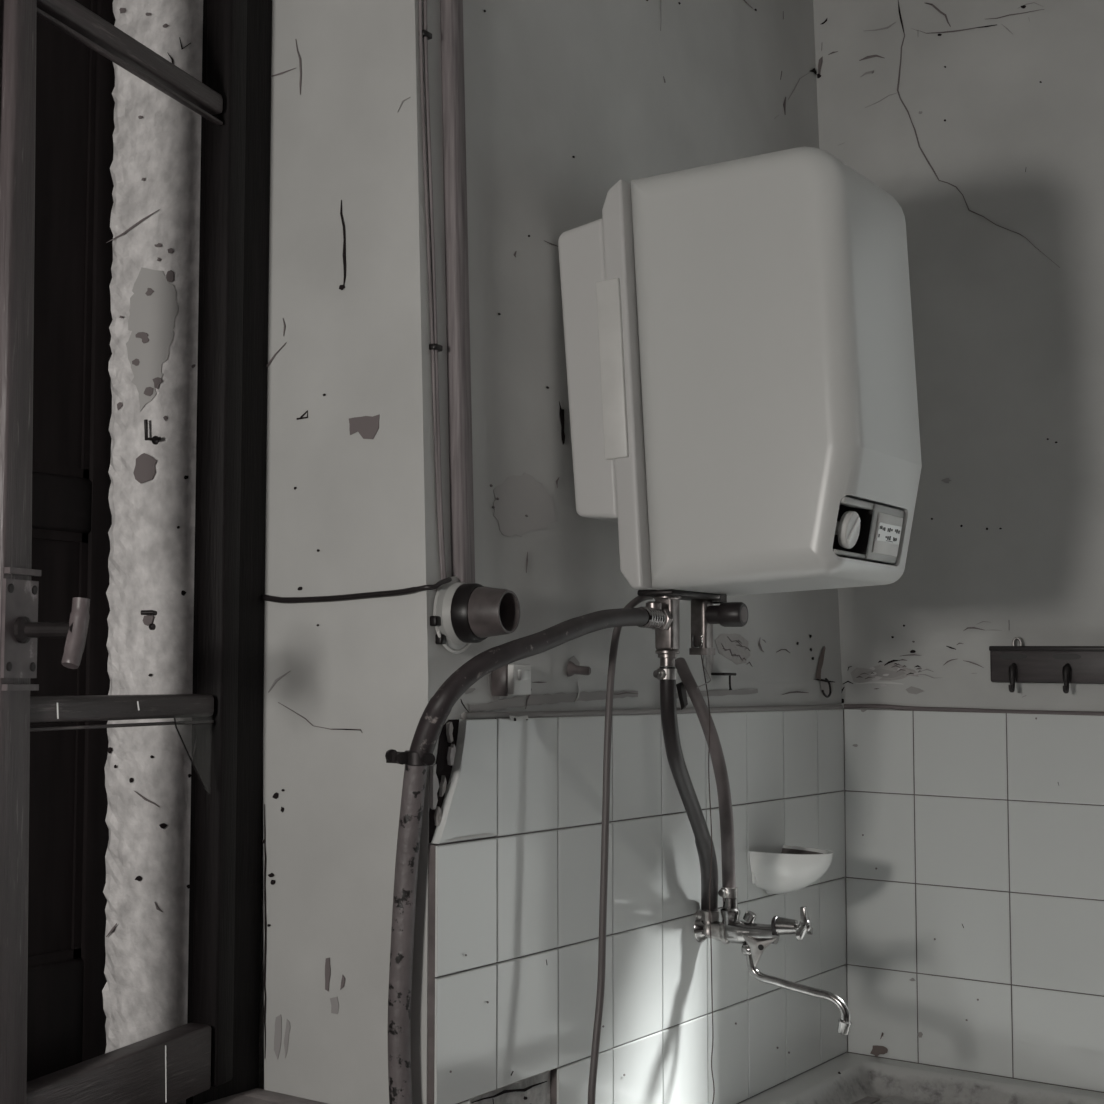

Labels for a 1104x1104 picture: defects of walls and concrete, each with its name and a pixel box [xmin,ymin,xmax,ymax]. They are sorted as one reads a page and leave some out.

crack [865,0,1060,268]
spalling [715,633,752,666]
peeling [851,641,922,689]
crack [278,702,362,732]
peeling [469,1070,551,1104]